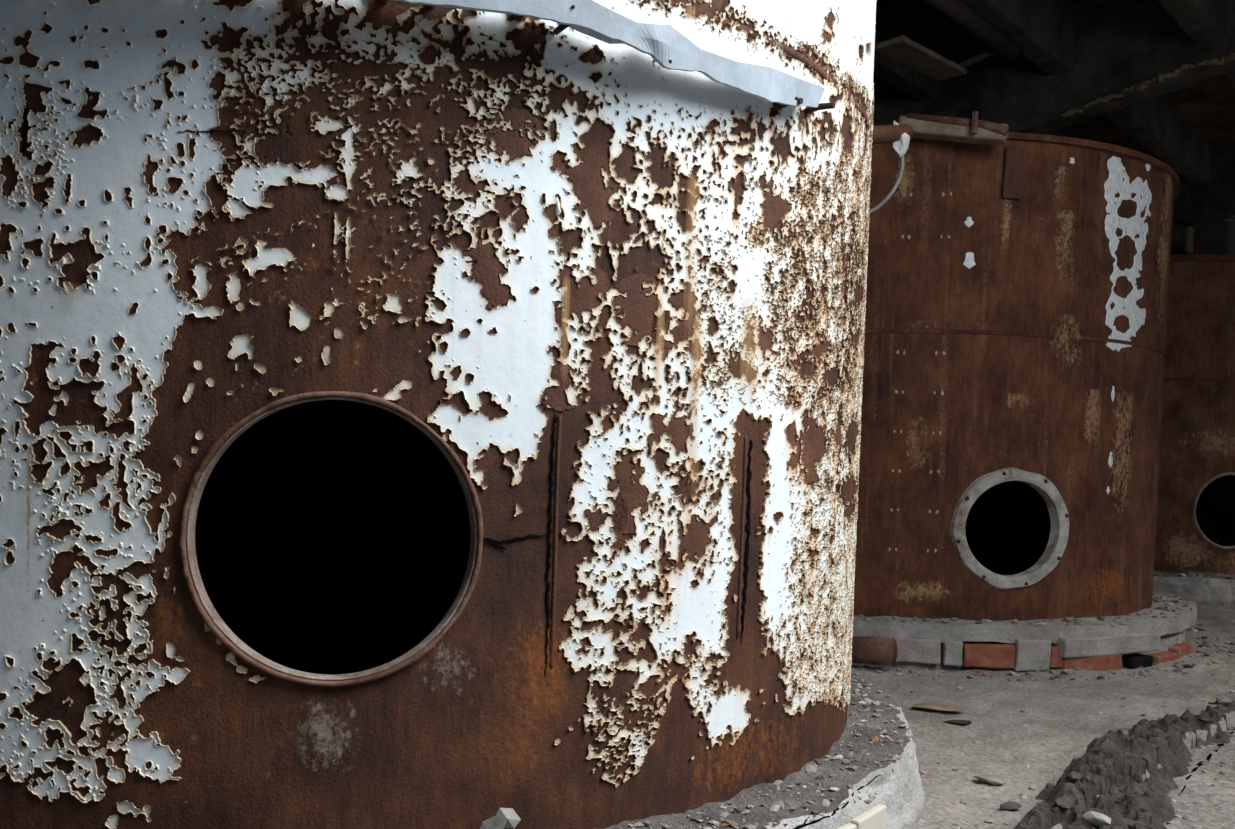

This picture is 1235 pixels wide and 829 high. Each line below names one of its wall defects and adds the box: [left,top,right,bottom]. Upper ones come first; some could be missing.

rust [566,155,623,229]
rust [745,178,803,246]
rust [463,239,513,309]
rust [554,264,706,359]
peeling [1104,156,1152,352]
peeling [0,0,877,829]
rust [648,400,694,454]
rust [786,411,843,483]
crack [483,414,559,676]
rust [584,463,659,546]
rust [670,510,718,570]
crack [741,439,753,643]